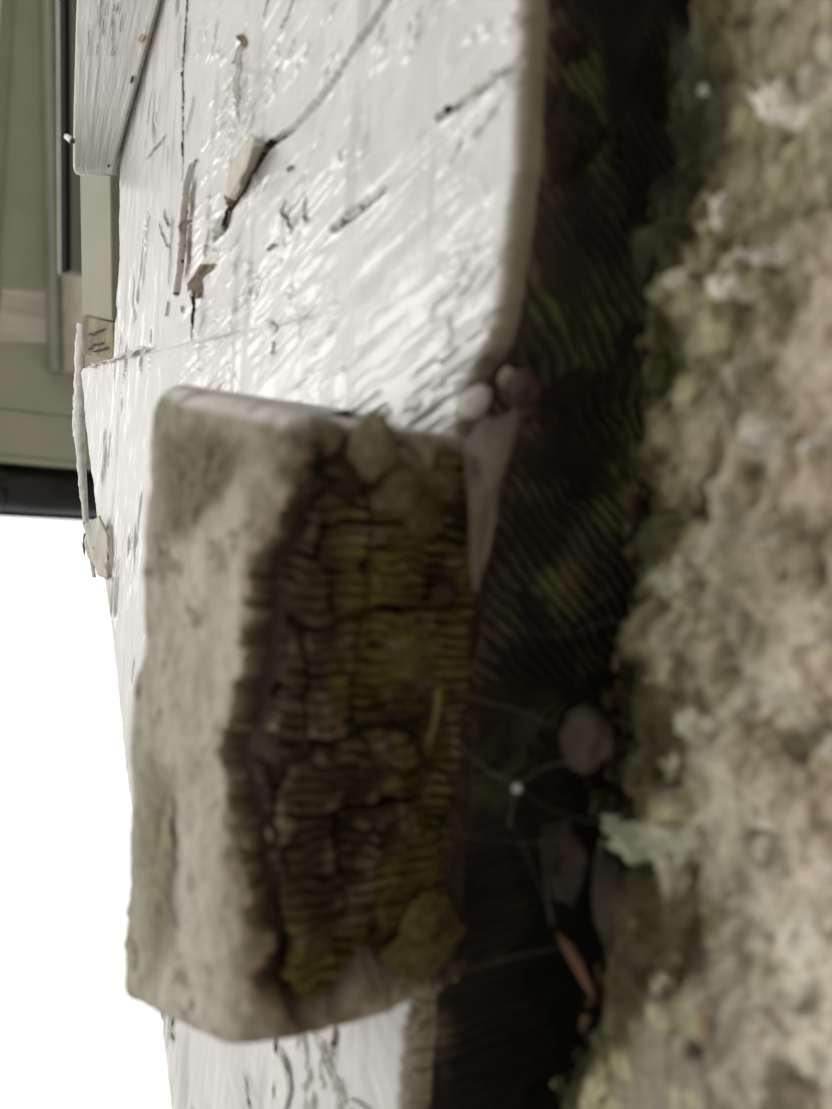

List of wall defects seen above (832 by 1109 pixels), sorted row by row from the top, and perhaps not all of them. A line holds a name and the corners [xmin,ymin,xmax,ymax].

peeling [181,134,288,329]
damp [159,432,234,535]
damp [141,763,172,961]
peeling [300,1034,326,1109]